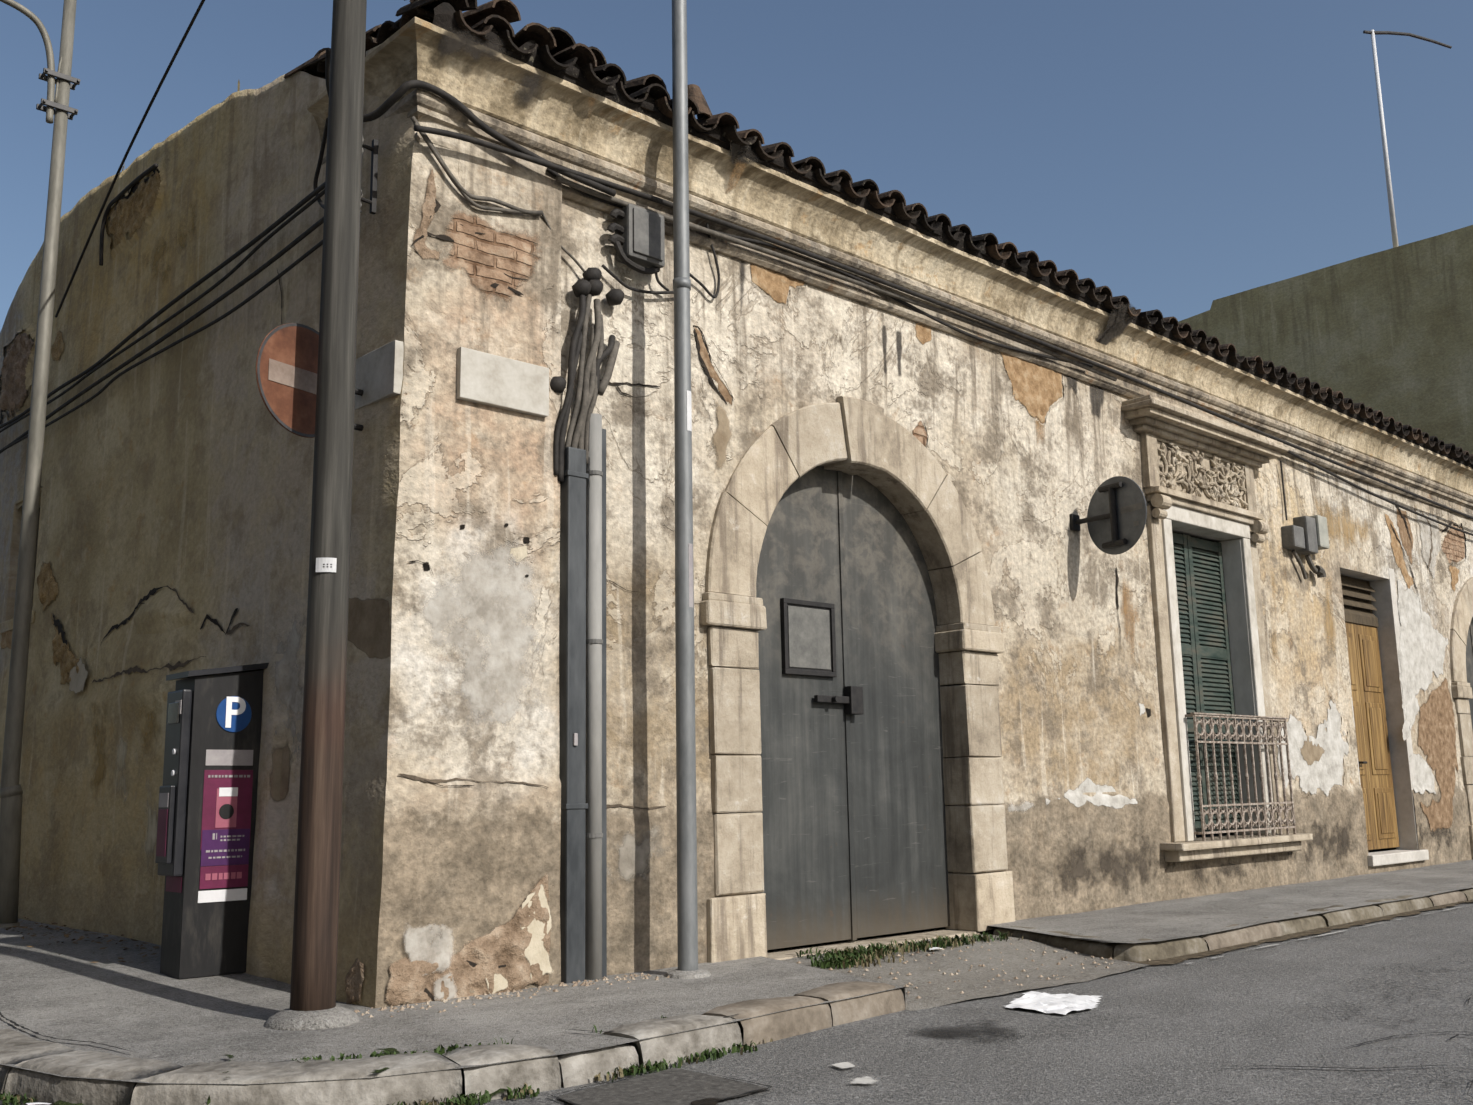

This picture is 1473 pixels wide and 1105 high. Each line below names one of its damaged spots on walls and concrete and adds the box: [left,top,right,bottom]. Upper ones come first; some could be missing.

spalling [105,157,166,261]
spalling [412,169,540,301]
flaking render [745,262,808,310]
spalling [0,322,64,424]
flaking render [995,351,1066,434]
crack [92,585,250,683]
flaking render [1385,506,1466,831]
flaking render [1008,777,1138,811]
flaking render [1274,692,1349,799]
spalling [386,875,552,1006]
crack [1341,1031,1471,1049]